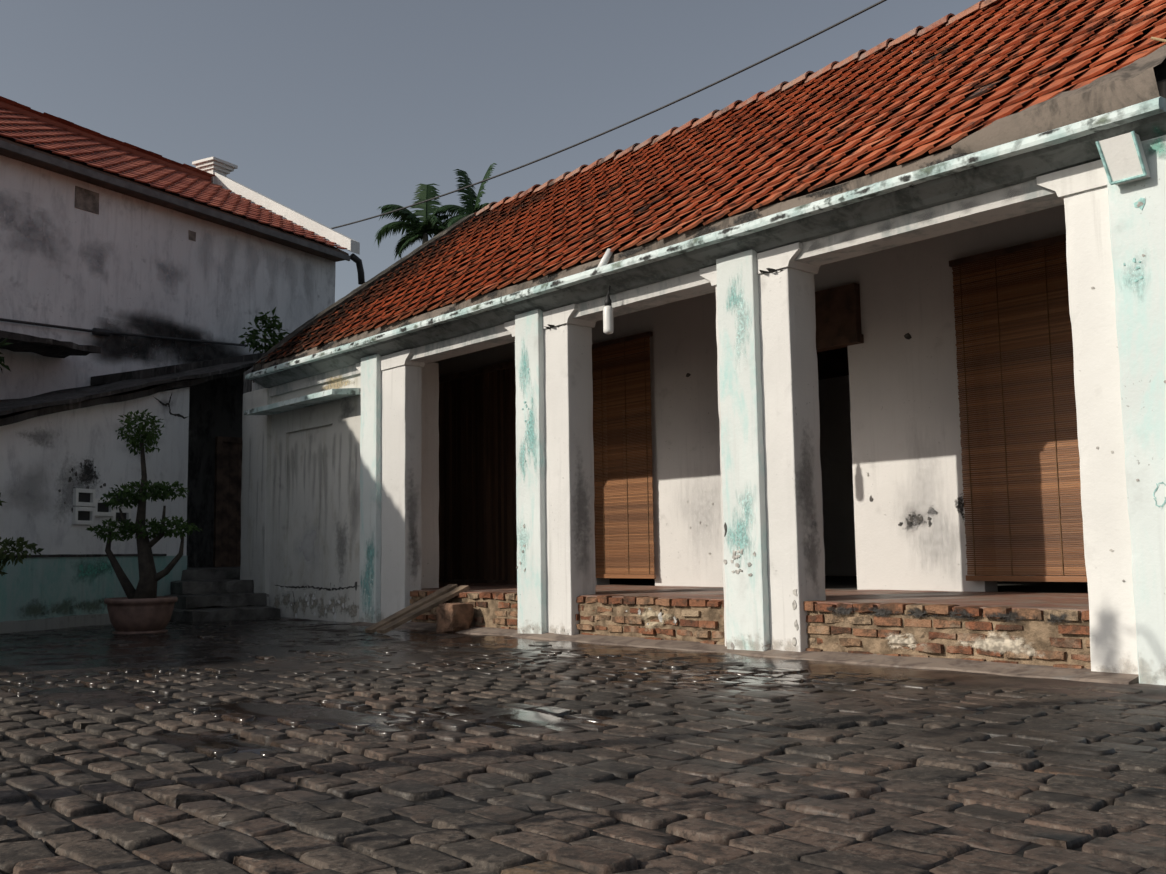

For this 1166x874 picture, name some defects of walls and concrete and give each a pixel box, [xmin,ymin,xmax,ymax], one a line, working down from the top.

peeling [521,398,534,475]
mould [58,460,106,512]
peeling [723,522,756,577]
crack [275,569,355,611]